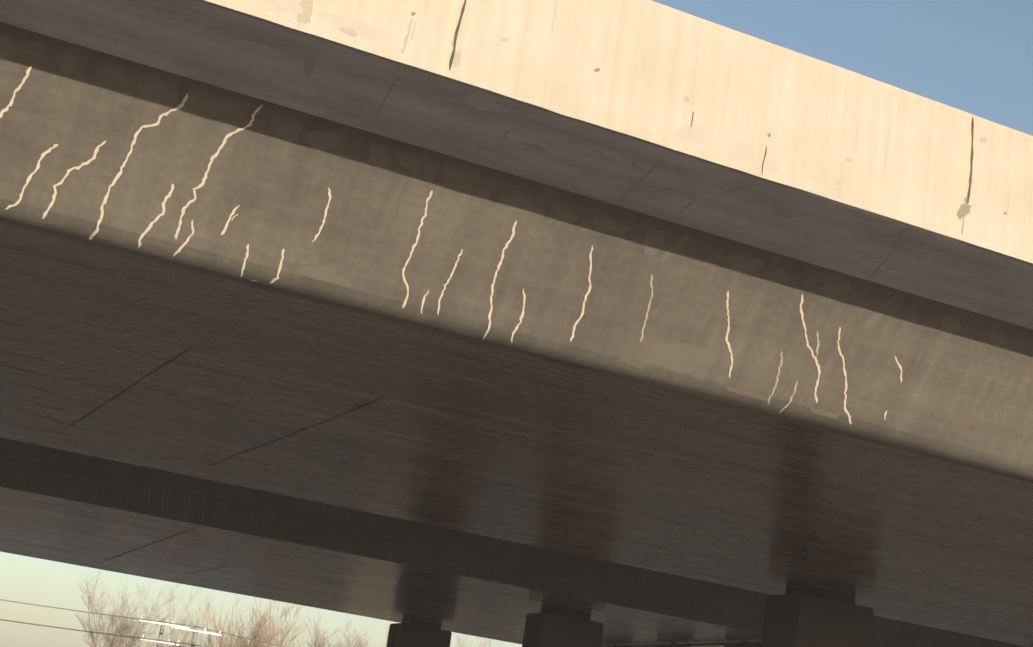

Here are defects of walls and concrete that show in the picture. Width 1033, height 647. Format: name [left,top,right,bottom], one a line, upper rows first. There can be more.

crack [0,66,32,118]
crack [449,0,467,70]
crack [5,141,106,219]
crack [89,94,188,240]
crack [138,105,263,257]
crack [961,118,974,234]
crack [240,244,285,284]
crack [402,191,463,314]
crack [483,221,526,343]
crack [570,246,593,341]
crack [725,291,733,378]
crack [768,294,851,424]